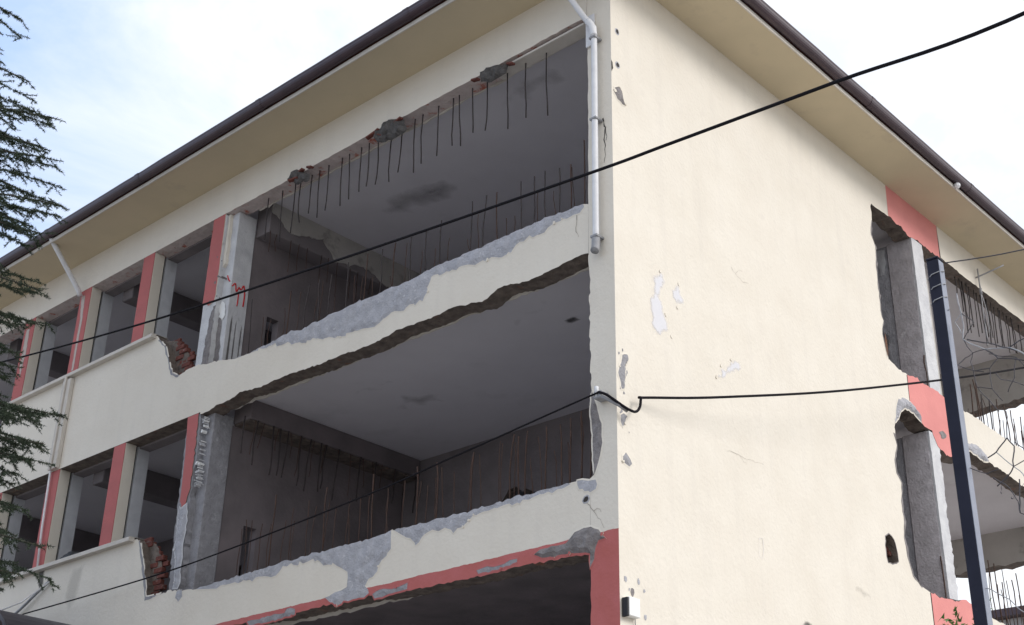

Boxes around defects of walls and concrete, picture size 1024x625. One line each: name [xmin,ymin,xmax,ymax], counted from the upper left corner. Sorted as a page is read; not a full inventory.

flaking render [613,85,627,107]
flaking render [235,140,586,359]
spalling [954,277,1022,354]
flaking render [617,348,629,394]
spalling [968,379,1024,450]
flaking render [194,388,606,608]
flaking render [622,451,633,469]
spalling [885,396,922,587]
peeling [138,503,188,601]
spalling [987,560,1024,625]